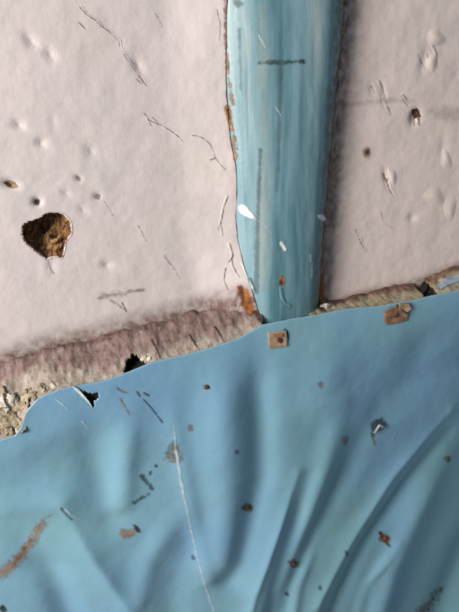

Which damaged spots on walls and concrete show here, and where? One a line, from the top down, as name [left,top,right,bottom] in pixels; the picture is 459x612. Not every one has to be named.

crack [78,5,144,83]
crack [143,113,209,143]
spalling [411,108,421,125]
spalling [20,211,73,261]
corrosion [237,286,264,324]
spalling [0,381,57,436]
corrosion [0,515,49,576]
corrosion [120,525,140,538]